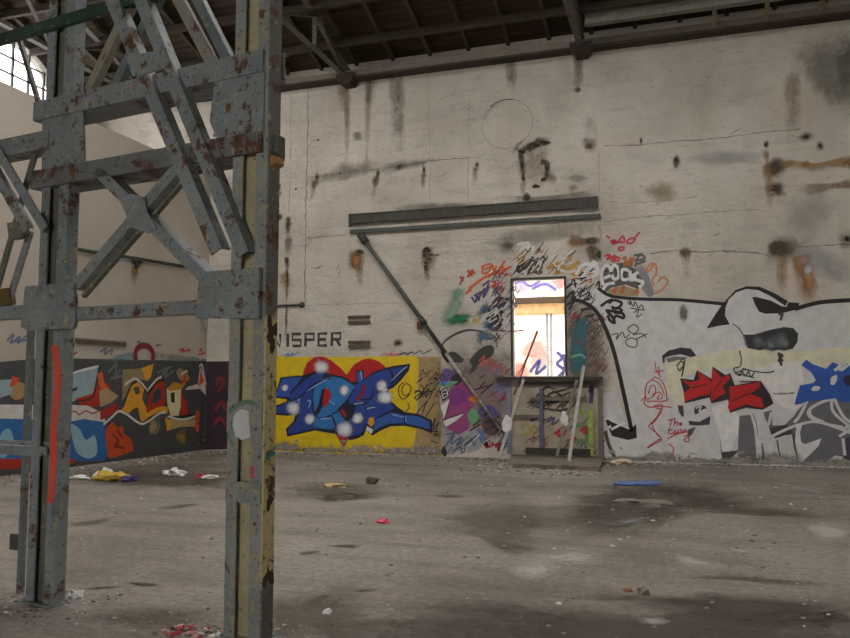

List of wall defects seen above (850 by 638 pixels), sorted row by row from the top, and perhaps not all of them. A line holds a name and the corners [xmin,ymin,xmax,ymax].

water stain [809,51,850,96]
rust [782,157,850,169]
crack [566,128,804,243]
rust [810,183,850,191]
rust [779,255,815,292]
rust [267,309,287,354]
rust [262,565,274,588]